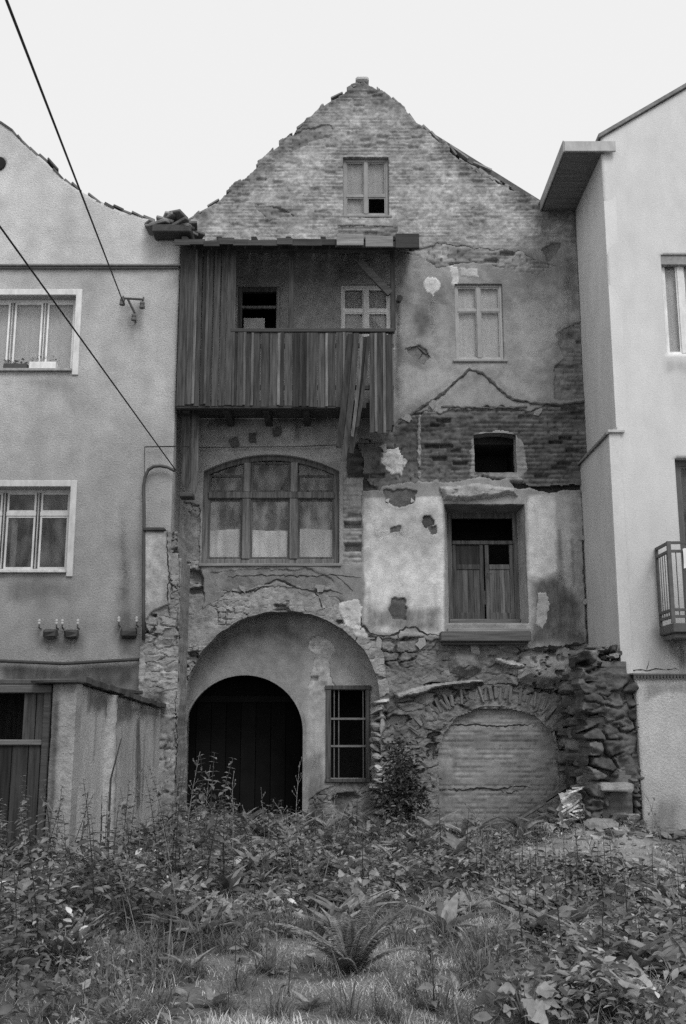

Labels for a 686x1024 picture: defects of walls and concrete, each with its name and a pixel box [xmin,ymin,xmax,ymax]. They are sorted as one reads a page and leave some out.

flaking render [404,243,560,275]
flaking render [343,323,587,564]
crack [226,574,359,608]
flaking render [142,503,581,823]
crack [444,721,535,729]
crack [440,785,528,794]